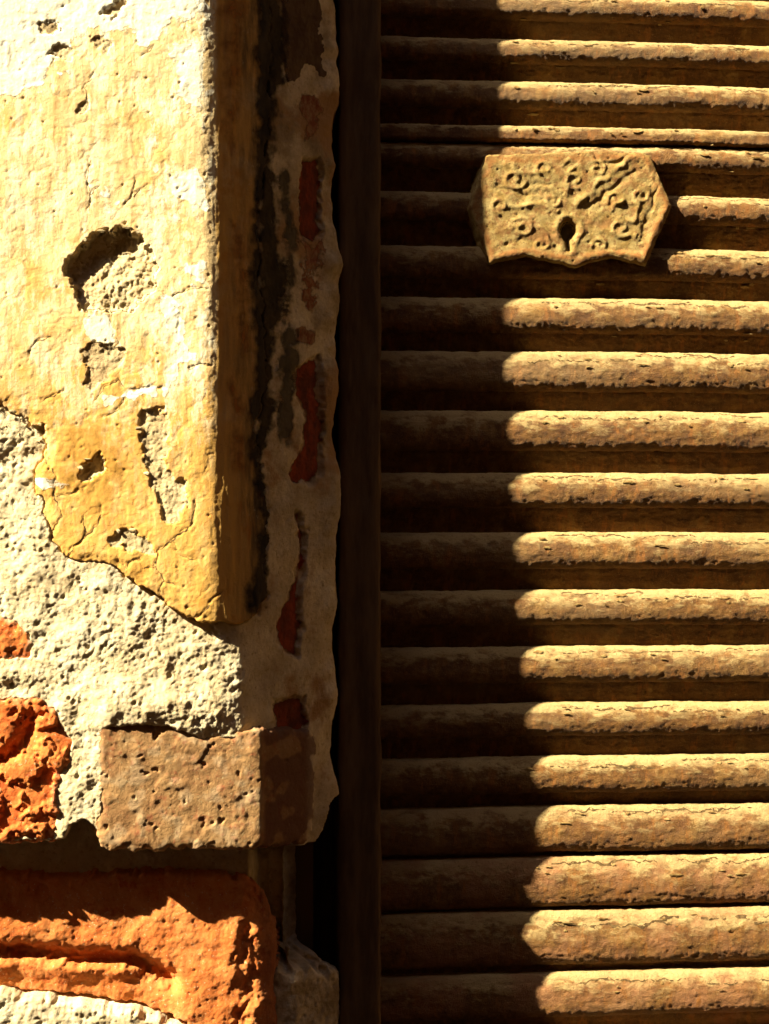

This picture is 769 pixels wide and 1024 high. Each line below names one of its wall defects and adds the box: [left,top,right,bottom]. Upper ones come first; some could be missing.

spalling [299,94,324,140]
peeling [183,260,206,287]
water stain [256,0,299,483]
spalling [298,159,326,311]
flaking render [0,407,45,441]
peeling [35,478,67,490]
flaking render [64,225,197,523]
flaking render [108,528,155,556]
spalling [276,514,306,655]
spalling [289,360,324,483]